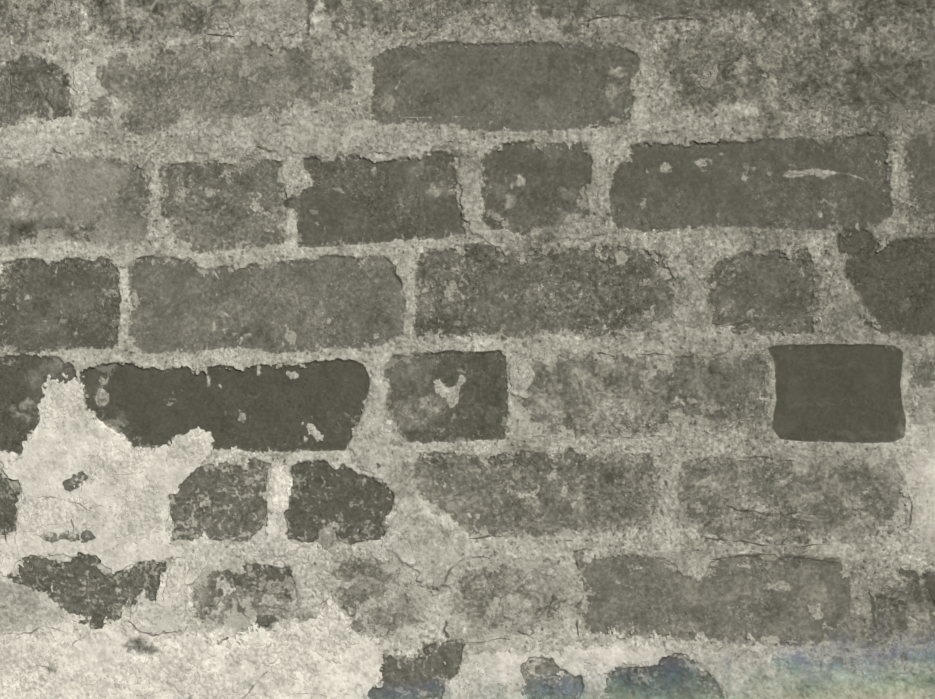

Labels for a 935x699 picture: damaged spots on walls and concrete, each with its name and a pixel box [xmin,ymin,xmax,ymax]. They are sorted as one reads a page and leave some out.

peeling [0,373,935,699]